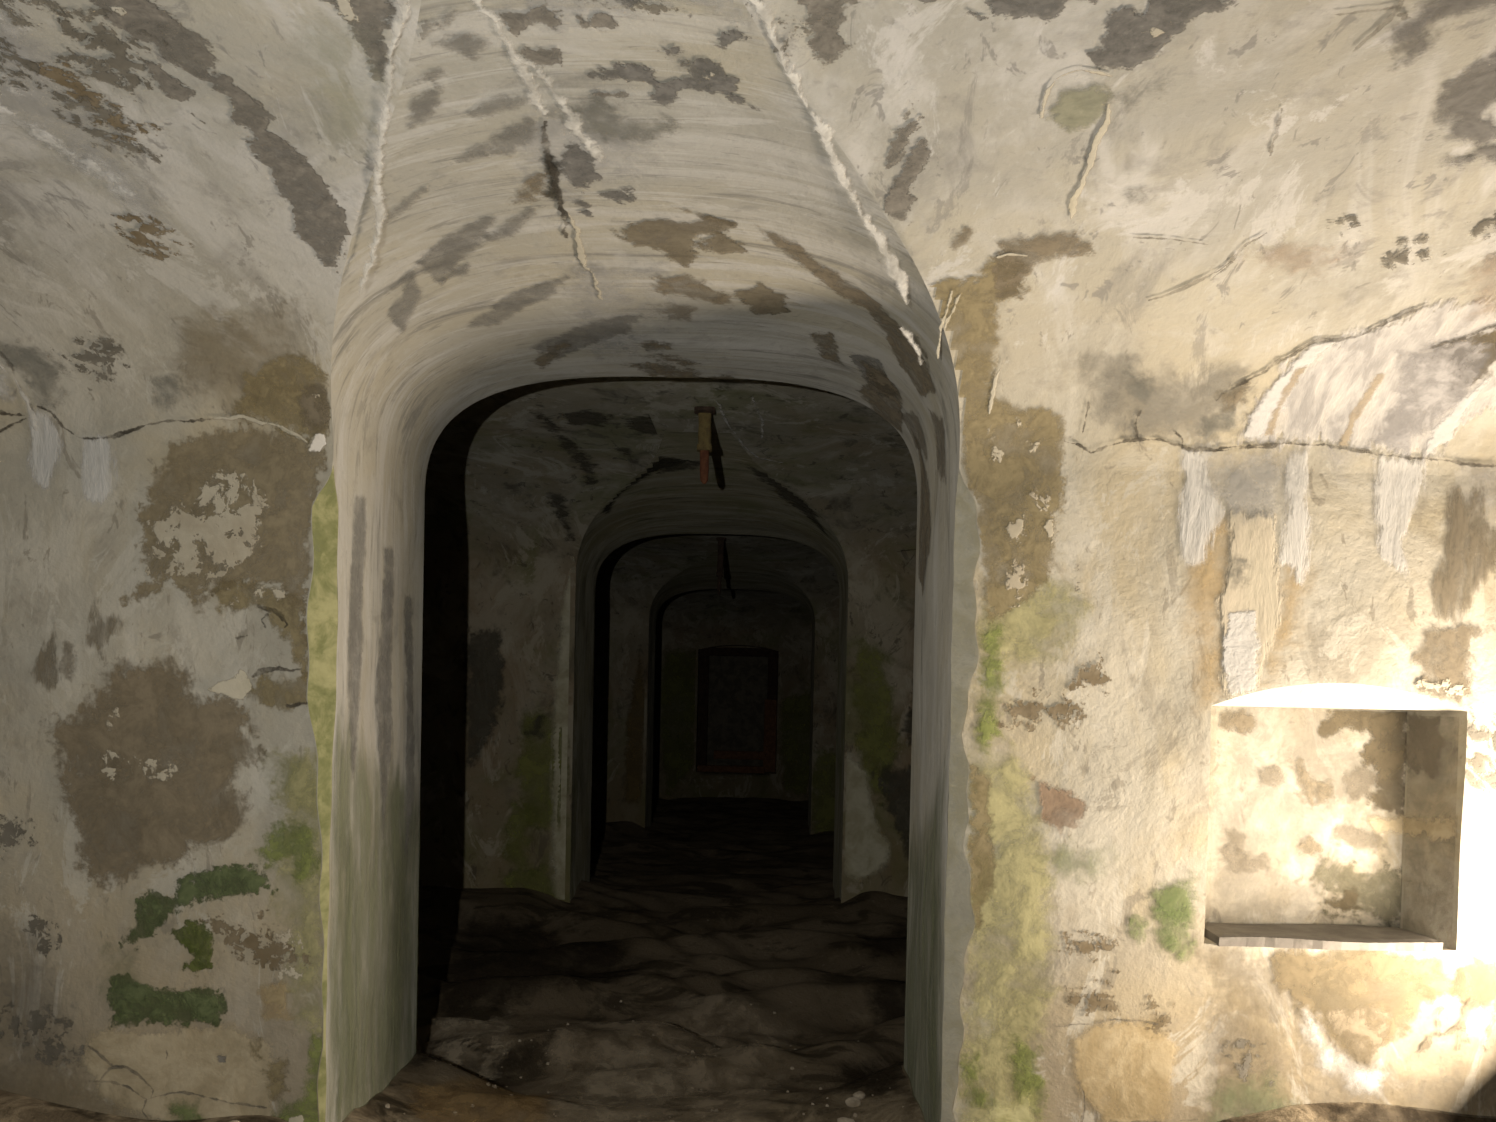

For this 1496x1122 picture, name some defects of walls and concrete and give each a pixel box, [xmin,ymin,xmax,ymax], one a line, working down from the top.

damp [419,13,485,59]
crack [472,0,604,300]
damp [389,97,675,331]
crack [0,354,307,443]
damp [931,233,1092,619]
crack [1072,410,1495,467]
crack [1216,307,1421,401]
crack [1434,324,1496,348]
damp [1106,299,1496,733]
peeling [212,581,308,675]
peeling [208,669,252,700]
damp [844,755,911,878]